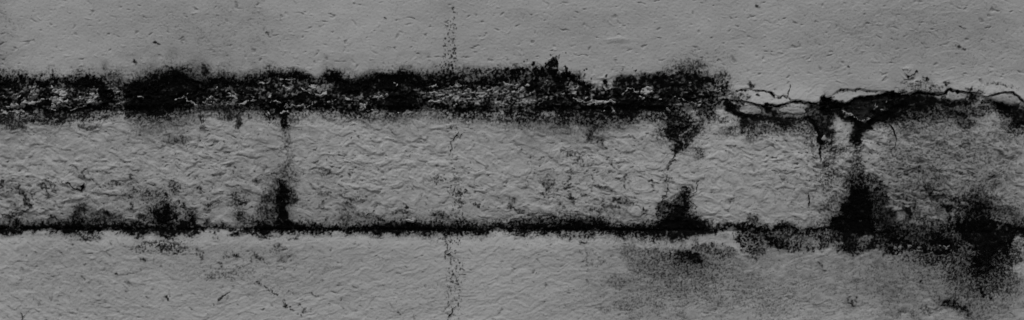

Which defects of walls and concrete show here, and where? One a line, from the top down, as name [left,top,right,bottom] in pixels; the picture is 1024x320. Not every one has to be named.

leakage [0,7,847,181]
leakage [0,77,1024,319]
crack [720,84,1024,149]